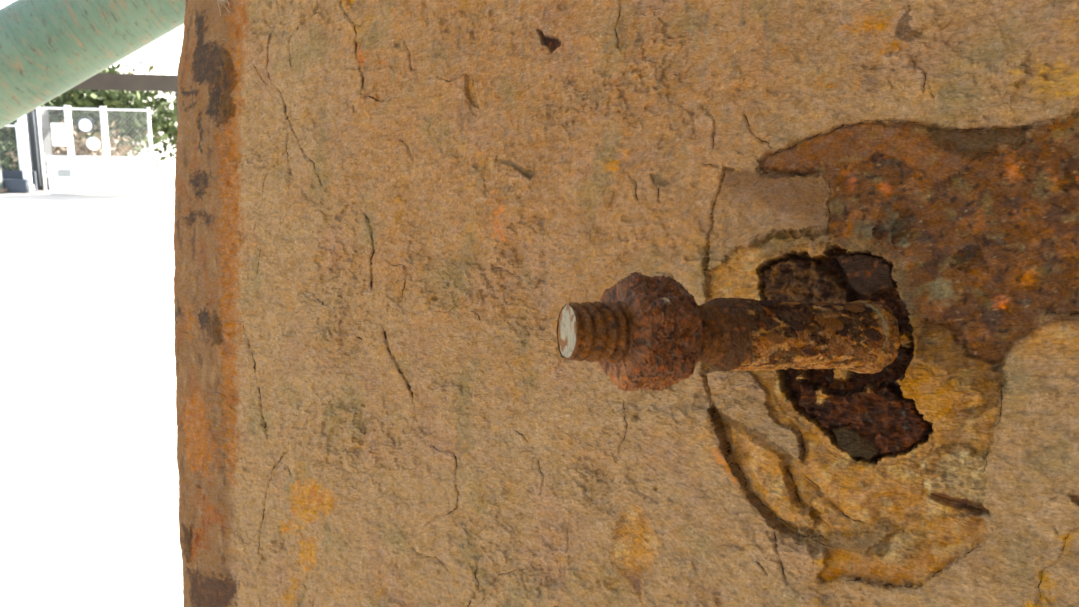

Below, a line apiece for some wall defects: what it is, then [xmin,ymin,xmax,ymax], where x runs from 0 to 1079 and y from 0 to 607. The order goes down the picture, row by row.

crack [347,16,379,101]
corrosion [987,46,1079,127]
corrosion [176,0,259,570]
crack [365,216,406,294]
crack [357,326,413,399]
spalling [696,107,1079,596]